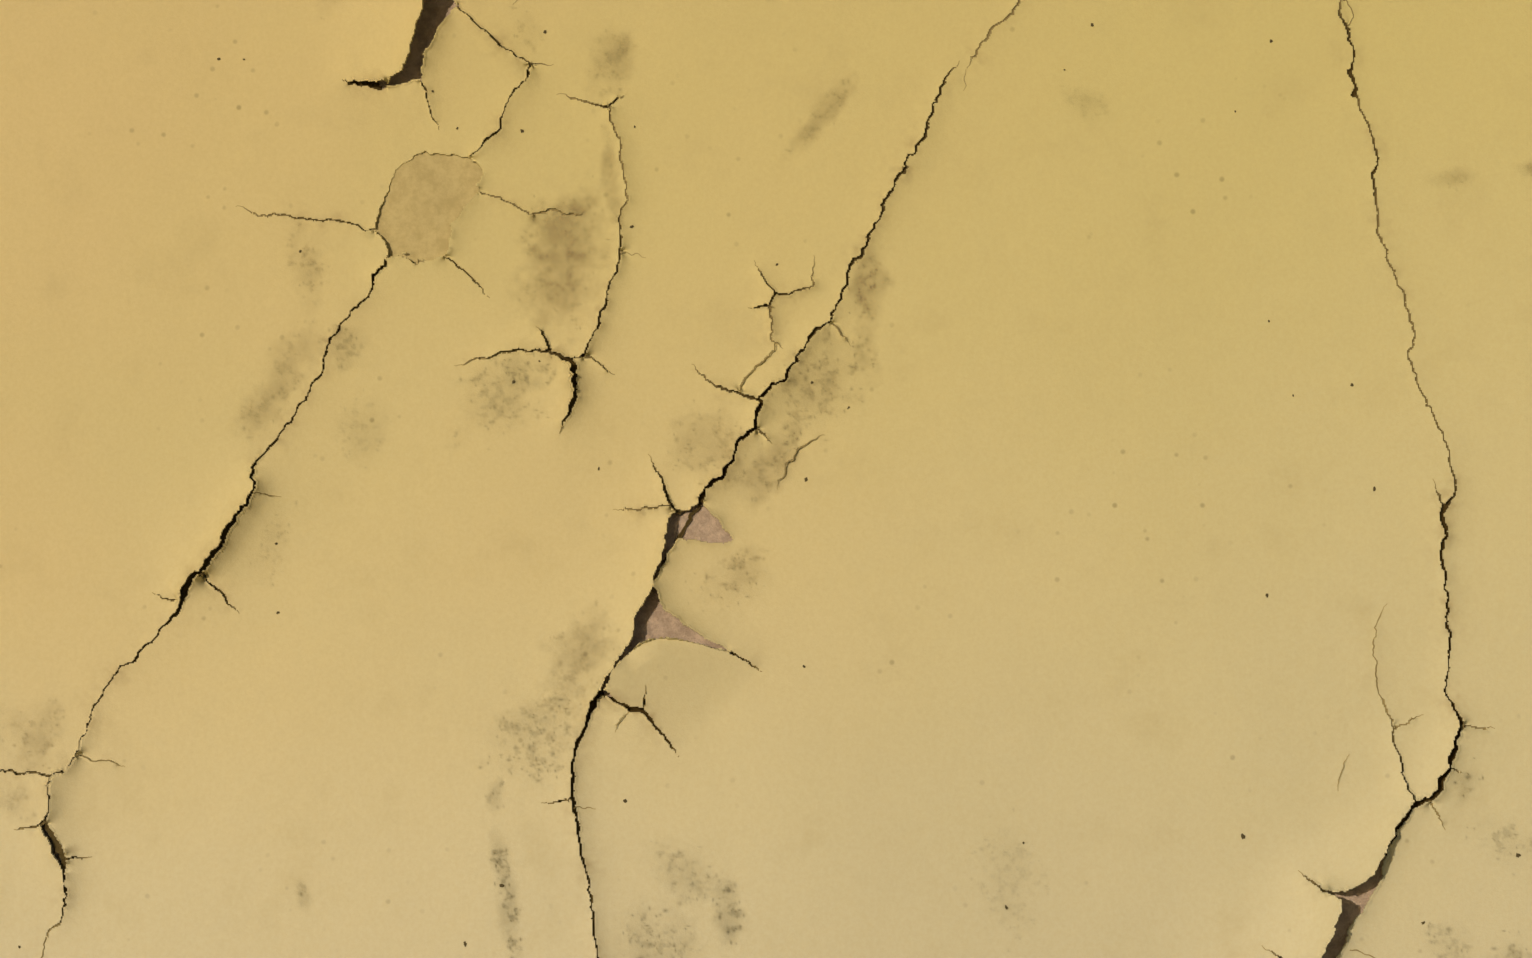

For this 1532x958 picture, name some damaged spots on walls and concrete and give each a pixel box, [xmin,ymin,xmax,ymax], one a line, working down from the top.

crack [0,205,404,958]
peeling [342,0,465,130]
crack [446,0,652,446]
crack [531,670,629,958]
peeling [554,454,768,757]
crack [685,0,1028,503]
peeling [1226,724,1482,958]
crack [1330,0,1495,836]